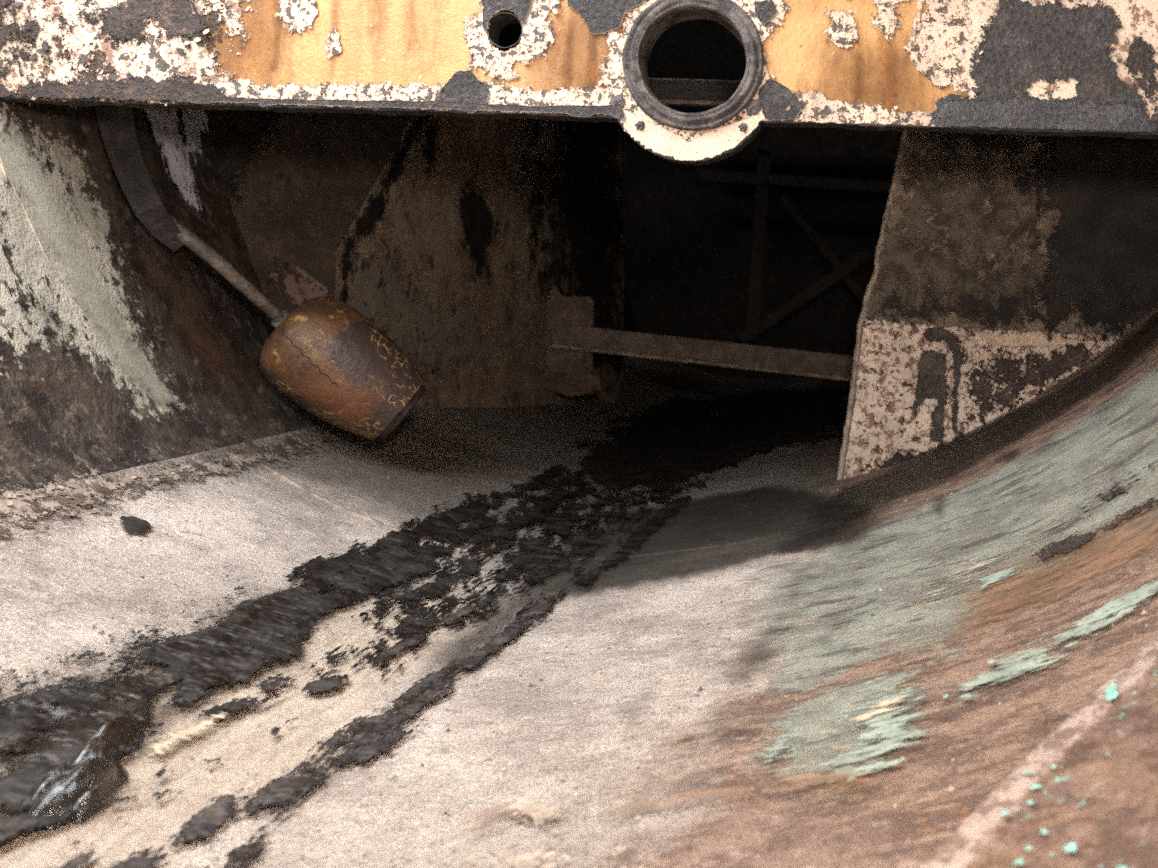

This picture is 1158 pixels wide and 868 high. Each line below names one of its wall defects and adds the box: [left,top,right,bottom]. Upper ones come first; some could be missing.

peeling [0,0,1158,386]
leakage [0,228,1158,868]
peeling [843,319,1119,479]